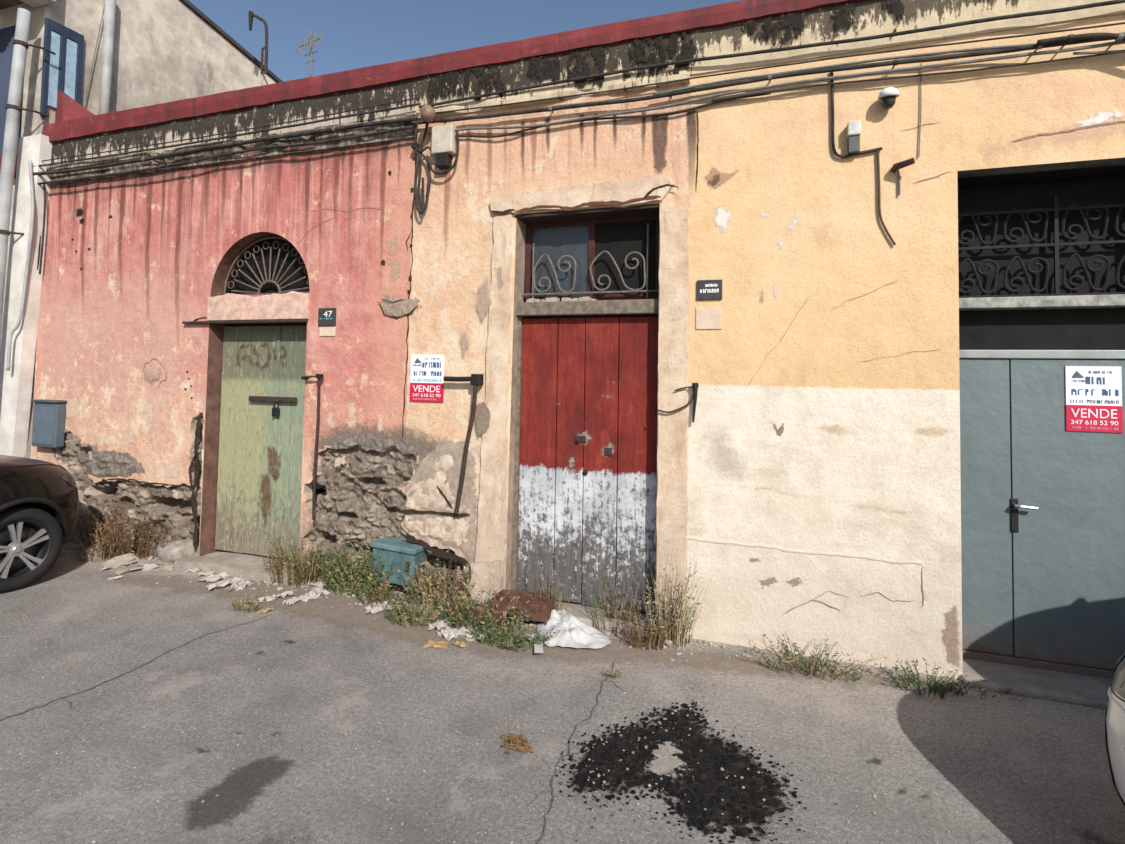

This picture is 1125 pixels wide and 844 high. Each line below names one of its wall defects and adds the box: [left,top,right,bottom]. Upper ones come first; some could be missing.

damp [427,64,505,101]
damp [527,44,609,88]
damp [687,110,696,144]
spalling [1012,110,1125,144]
damp [59,163,226,256]
spalling [706,168,737,188]
spalling [51,396,204,556]
spalling [306,402,505,604]
crack [783,564,924,615]
crack [1,615,269,720]
crack [536,659,618,844]
damp [188,757,291,830]